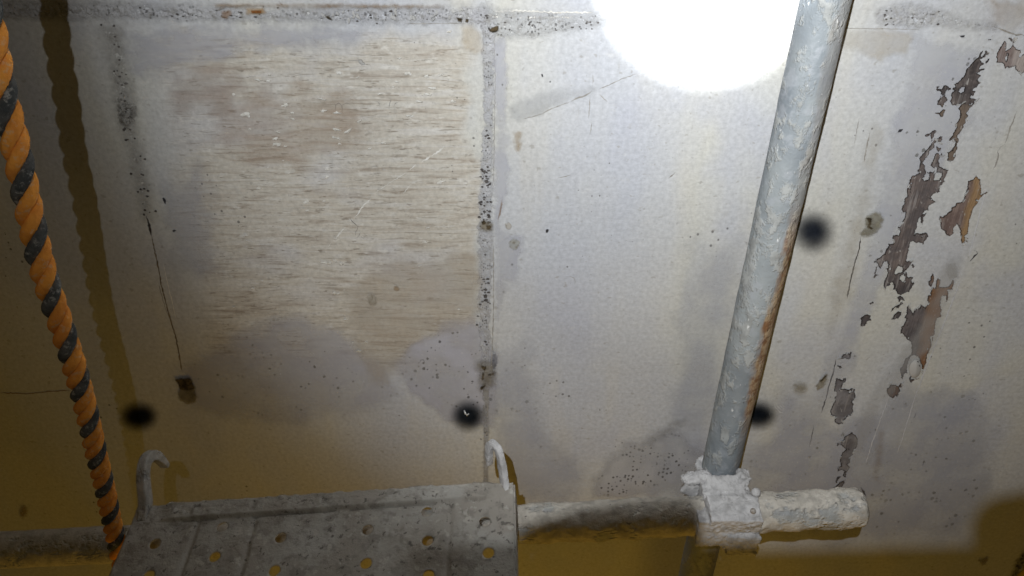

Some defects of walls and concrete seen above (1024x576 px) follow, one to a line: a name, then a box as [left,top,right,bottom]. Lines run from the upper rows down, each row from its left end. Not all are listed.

spalling [861,213,883,236]
peeling [874,38,1024,398]
crack [146,217,182,370]
leakage [407,326,495,424]
leakage [595,436,698,496]
peeling [798,352,858,488]